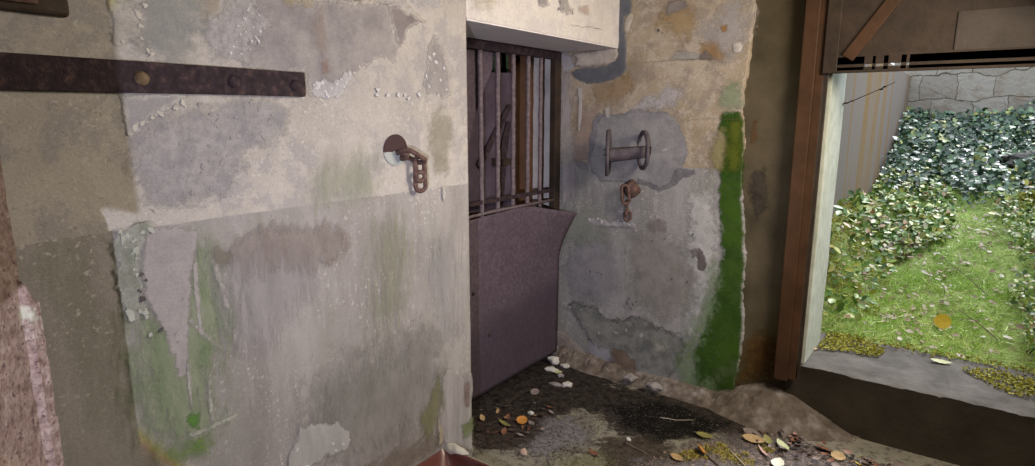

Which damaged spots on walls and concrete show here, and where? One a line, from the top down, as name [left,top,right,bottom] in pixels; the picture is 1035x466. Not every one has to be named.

water stain [710,122,741,170]
peeling [112,222,155,322]
water stain [189,262,215,344]
water stain [214,219,349,346]
spalling [557,290,686,378]
water stain [630,190,739,391]
peeling [289,422,351,466]